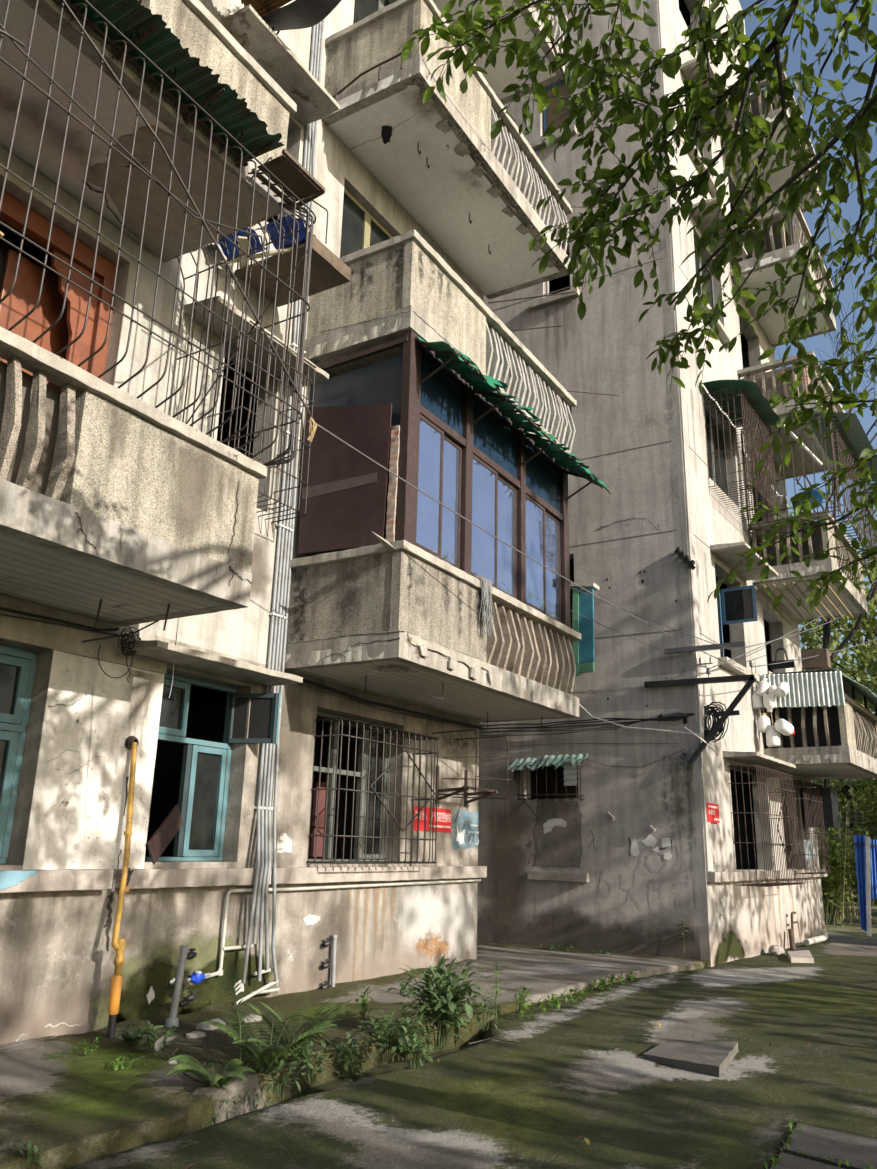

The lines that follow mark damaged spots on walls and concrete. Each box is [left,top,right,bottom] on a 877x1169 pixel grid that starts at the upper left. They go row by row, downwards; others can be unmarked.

crack [76,512,122,557]
crack [214,481,253,587]
water stain [292,568,308,642]
peeling [0,871,39,890]
water stain [490,806,701,960]